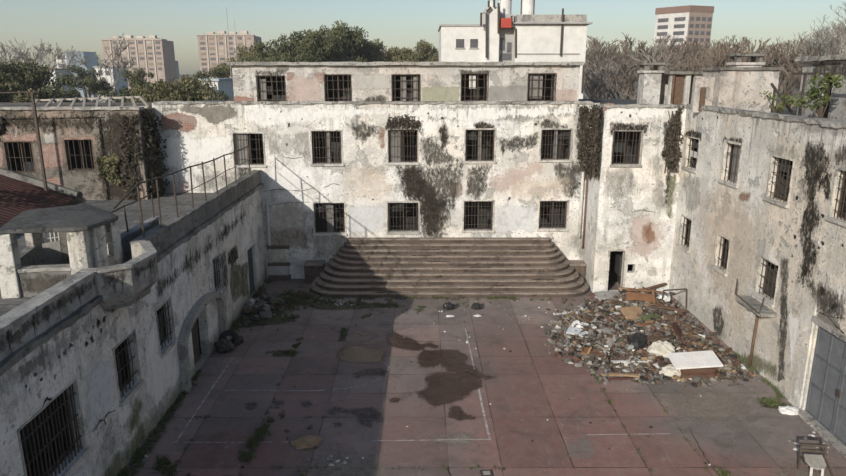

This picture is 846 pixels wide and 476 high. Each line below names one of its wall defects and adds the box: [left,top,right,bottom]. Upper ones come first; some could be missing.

spalling [160,95,253,133]
water stain [350,116,490,237]
water stain [499,105,648,197]
water stain [661,108,701,204]
water stain [778,141,846,381]